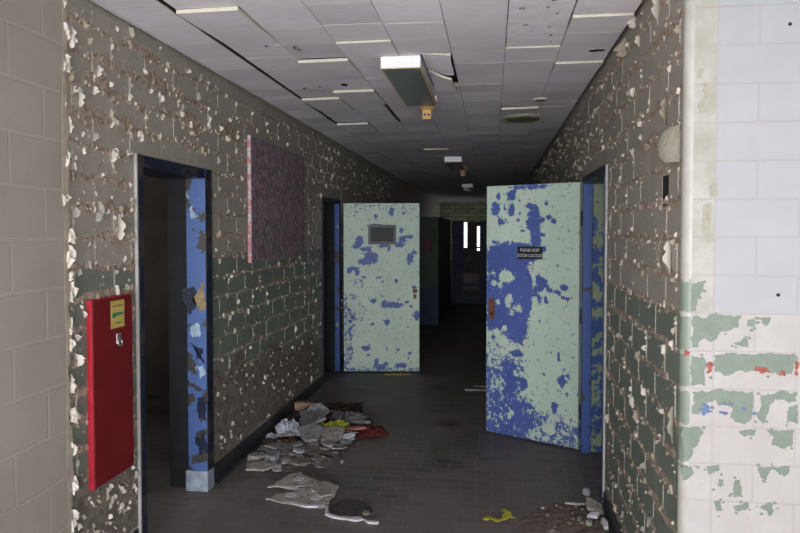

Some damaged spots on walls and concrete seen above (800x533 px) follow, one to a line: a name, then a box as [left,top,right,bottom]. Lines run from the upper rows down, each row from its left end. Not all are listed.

peeling [62,0,391,533]
peeling [535,0,800,533]